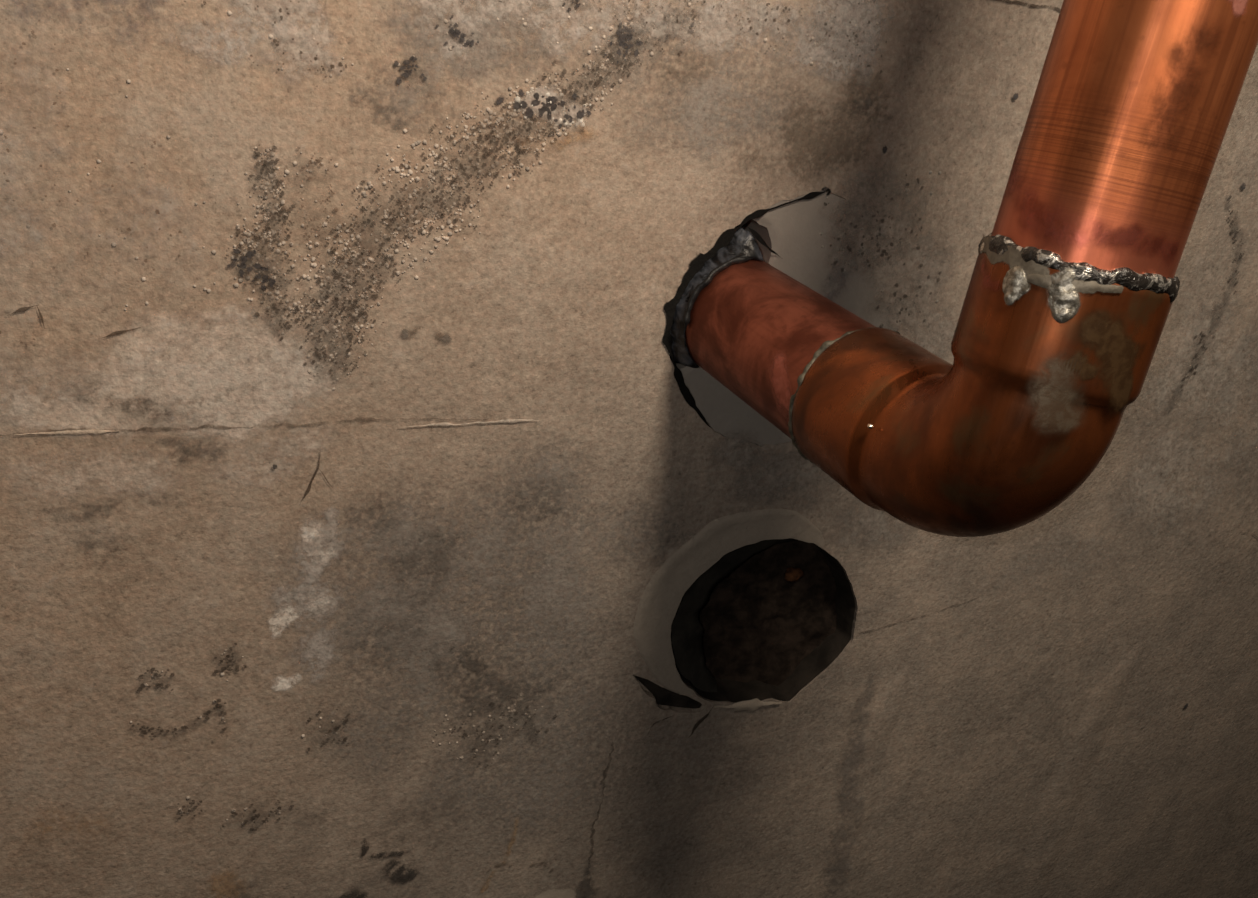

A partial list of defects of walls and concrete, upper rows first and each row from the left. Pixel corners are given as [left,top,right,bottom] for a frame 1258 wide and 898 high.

crack [1000,0,1061,12]
damp [180,0,333,64]
crack [129,418,380,431]
crack [0,428,87,436]
crack [300,456,333,504]